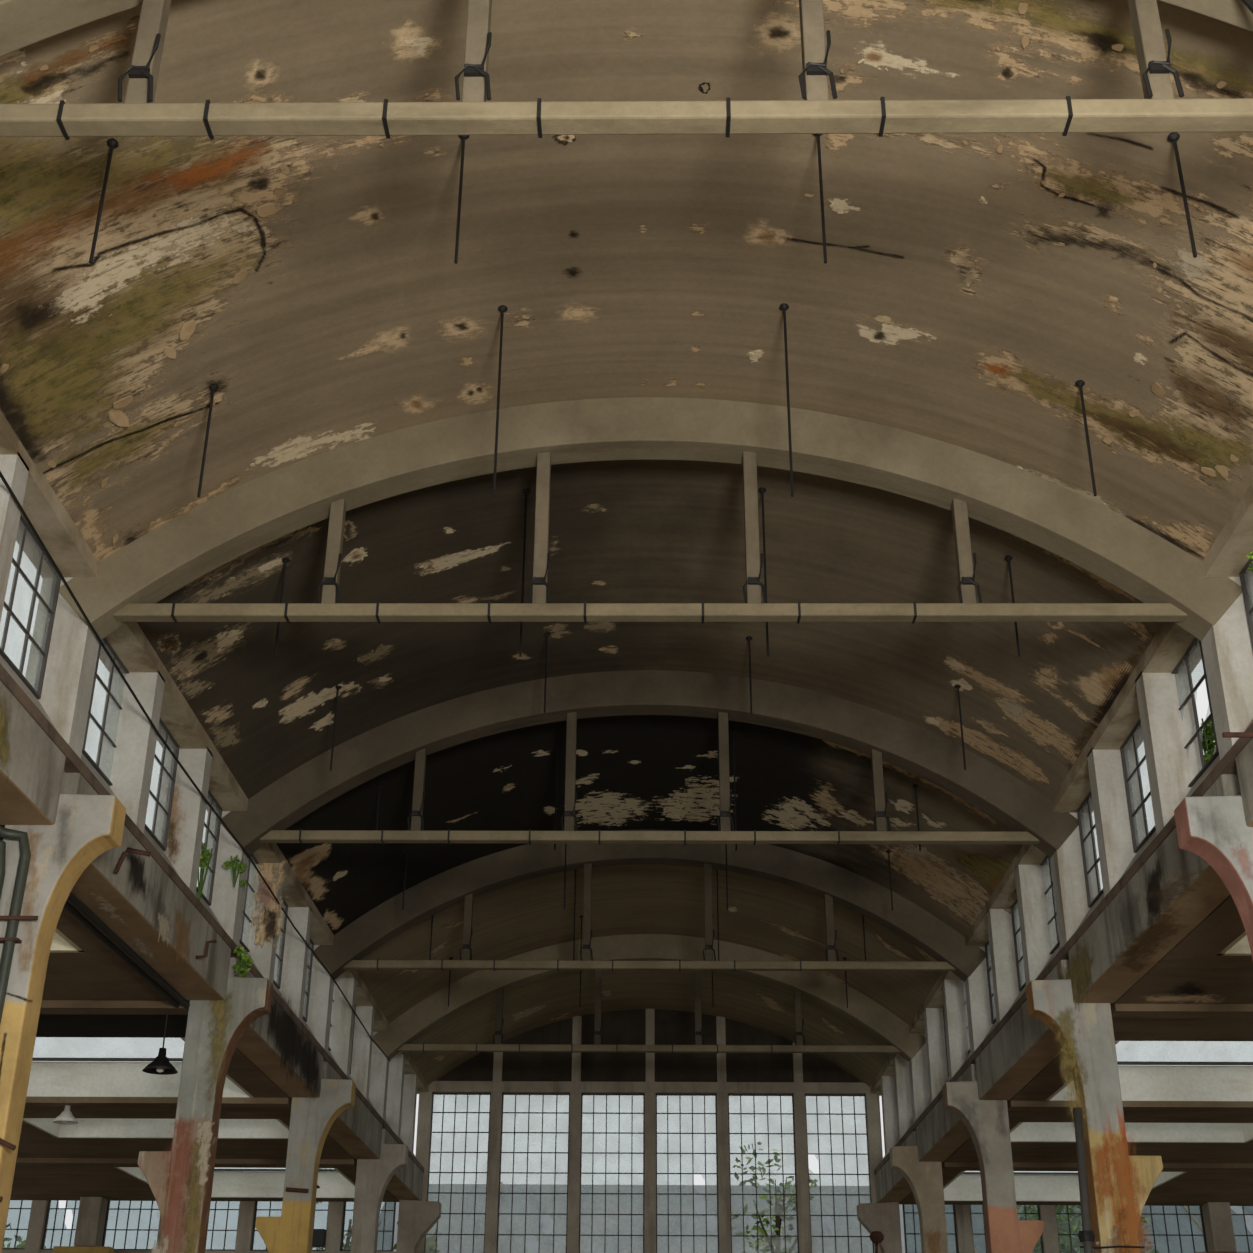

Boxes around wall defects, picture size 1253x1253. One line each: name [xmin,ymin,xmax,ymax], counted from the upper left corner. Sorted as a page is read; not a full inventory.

peeling [1206,132,1253,169]
water stain [0,136,341,462]
water stain [968,133,1253,500]
peeling [34,368,376,563]
peeling [157,622,251,701]
peeling [202,704,240,751]
peeling [252,673,394,731]
peeling [922,622,1132,787]
peeling [575,751,738,827]
peeling [762,779,874,831]
water stain [268,1000,319,1094]
rust [1094,1135,1143,1253]